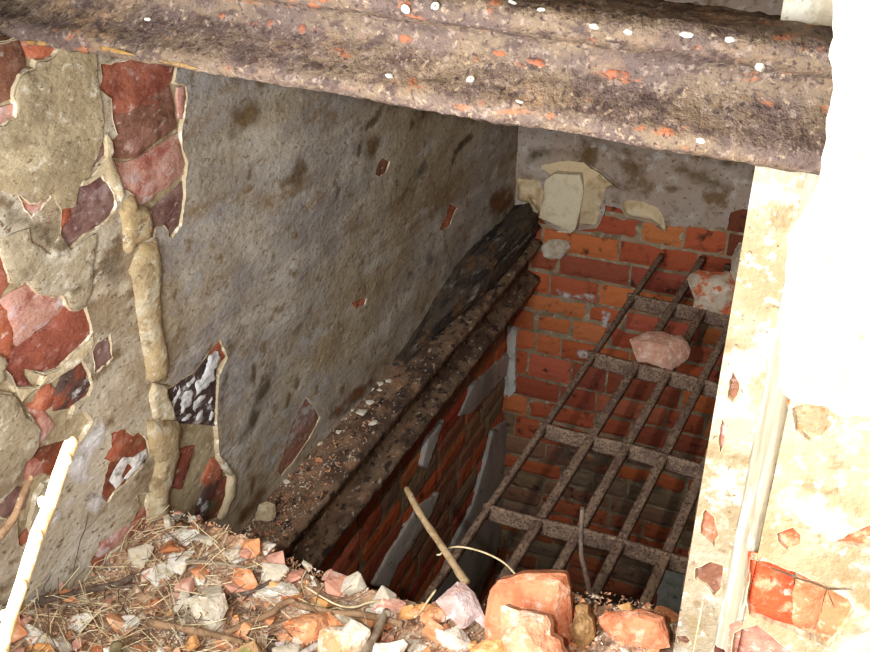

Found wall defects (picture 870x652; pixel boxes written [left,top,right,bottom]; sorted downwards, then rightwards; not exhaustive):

peeling [665,0,784,15]
peeling [515,126,755,231]
peeling [0,36,189,549]
spalling [148,339,228,525]
spalling [700,508,719,548]
spalling [727,551,854,652]